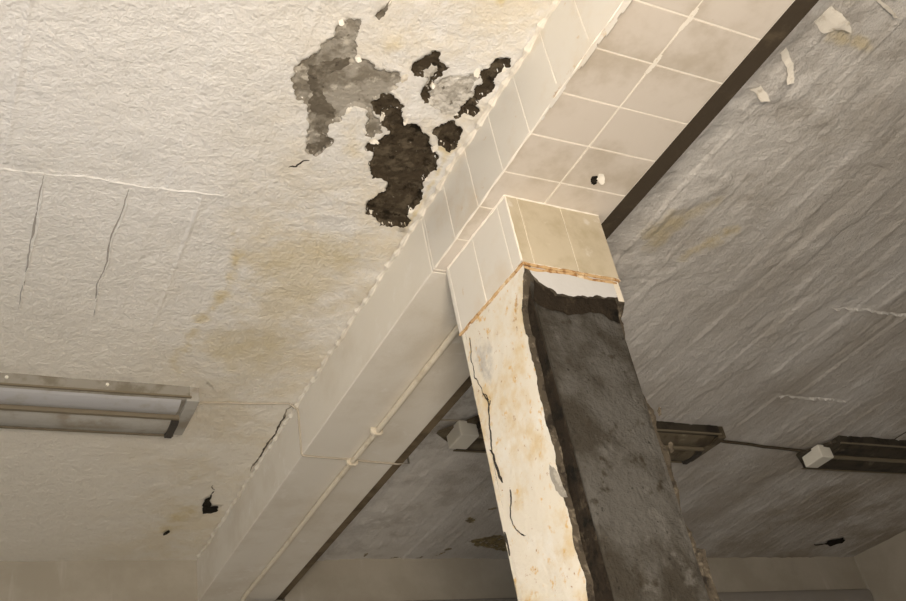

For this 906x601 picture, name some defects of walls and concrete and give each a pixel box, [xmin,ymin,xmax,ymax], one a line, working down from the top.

flaking render [375,1,392,20]
flaking render [290,18,511,228]
flaking render [749,86,770,102]
flaking render [781,48,795,85]
flaking render [814,0,860,34]
crack [19,176,46,305]
crack [94,190,131,314]
leakage [0,183,407,398]
rust [509,283,523,342]
flaking render [202,485,218,514]
crack [469,338,526,556]
flaking render [527,279,710,601]